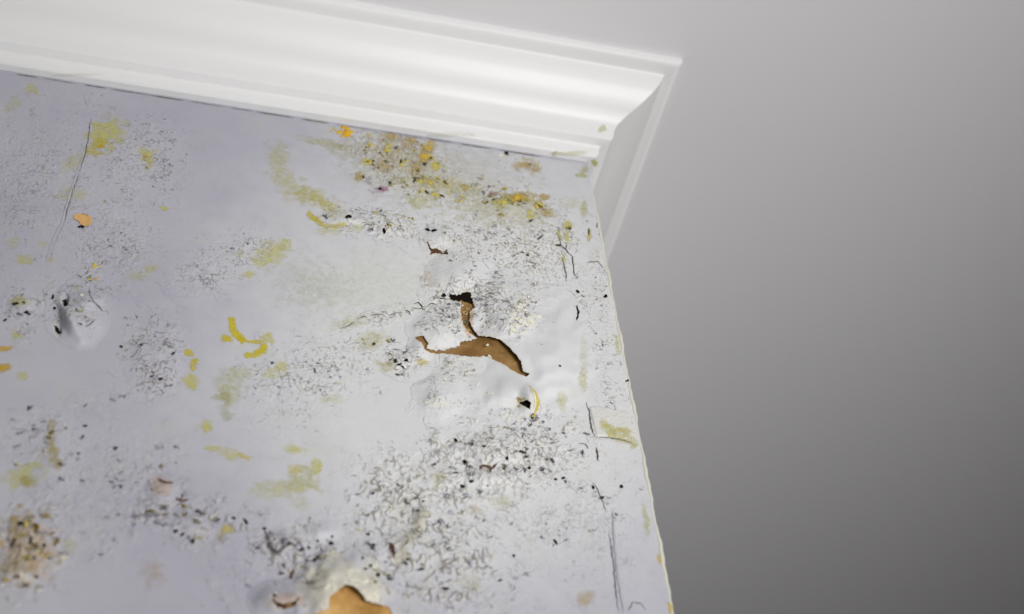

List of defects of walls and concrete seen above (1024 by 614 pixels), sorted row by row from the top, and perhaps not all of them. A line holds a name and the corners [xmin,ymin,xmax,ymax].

mould [329,125,354,137]
crack [46,119,92,261]
mould [355,132,441,197]
leakage [494,193,550,218]
peeling [0,80,656,614]
leakage [516,385,540,417]